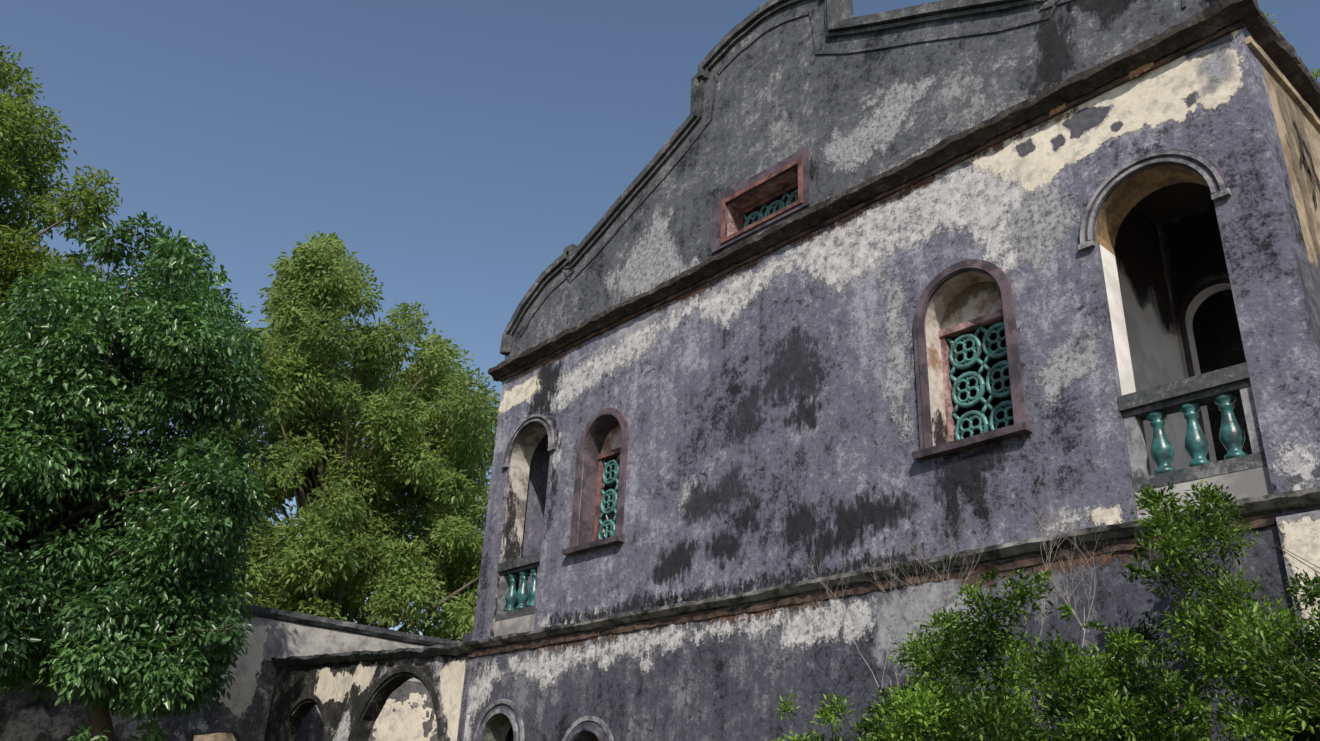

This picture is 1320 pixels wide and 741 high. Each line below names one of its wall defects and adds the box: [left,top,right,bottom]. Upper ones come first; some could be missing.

flaking render [498,30,1244,444]
flaking render [550,431,564,483]
damp [549,325,1005,626]
flaking render [0,703,76,741]
flaking render [313,595,877,741]
flaking render [1279,516,1320,683]